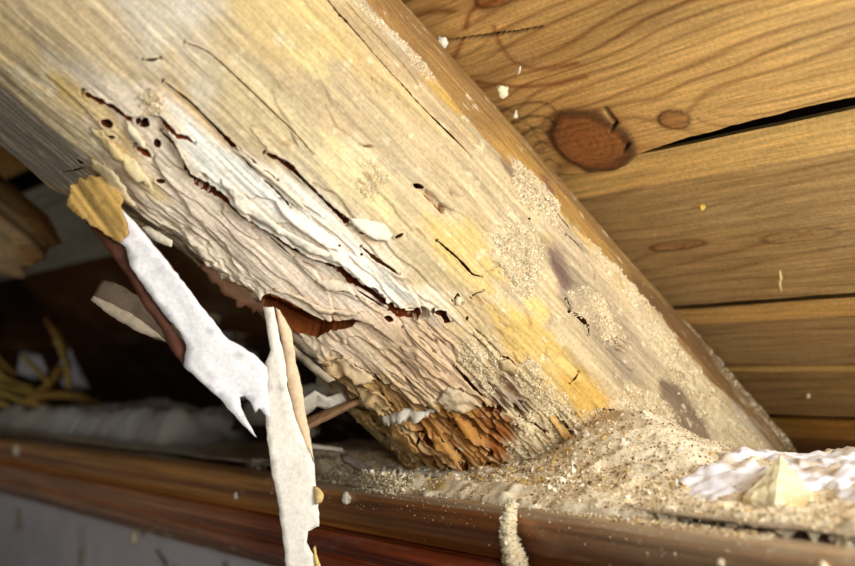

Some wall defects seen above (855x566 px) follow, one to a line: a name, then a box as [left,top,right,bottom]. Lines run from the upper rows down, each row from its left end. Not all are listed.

peeling [89,127,153,209]
peeling [125,120,148,149]
peeling [221,147,372,296]
crack [83,40,574,435]
peeling [348,218,393,243]
peeling [321,355,486,469]